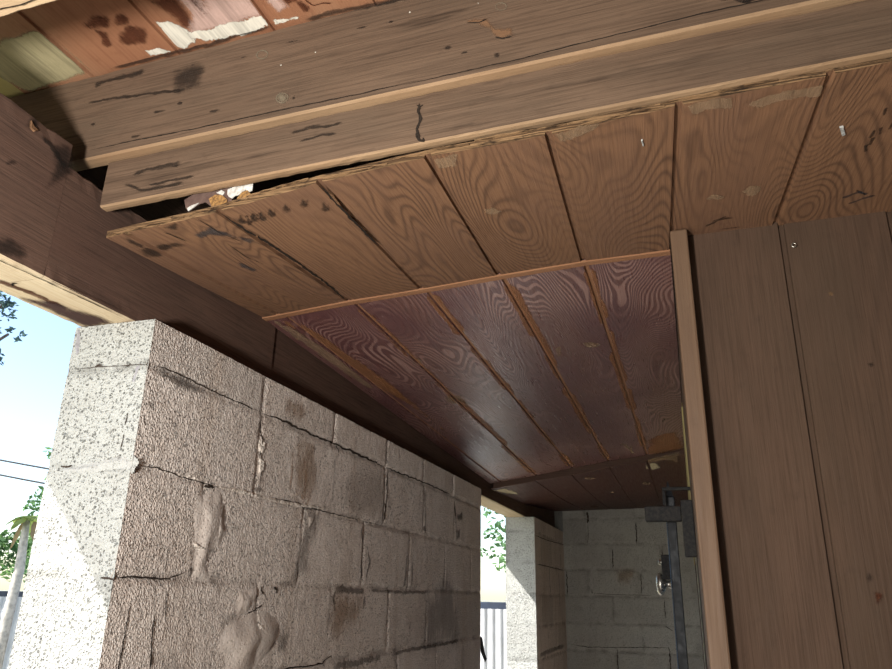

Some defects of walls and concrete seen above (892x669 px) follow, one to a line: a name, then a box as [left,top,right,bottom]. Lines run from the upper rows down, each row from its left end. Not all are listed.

water stain [92,68,202,104]
water stain [85,0,398,85]
crack [93,0,763,150]
crack [75,364,457,538]
crack [100,572,184,580]
crack [285,654,331,669]